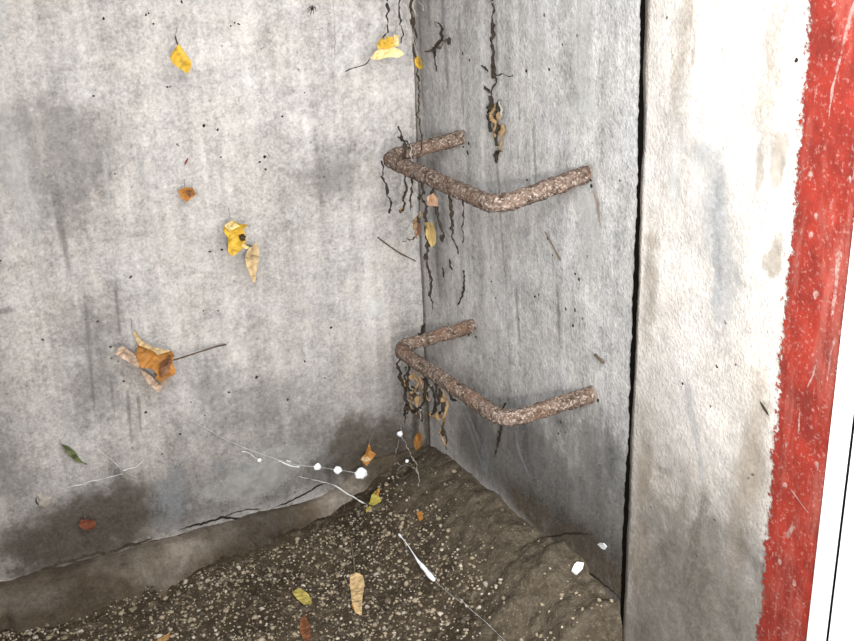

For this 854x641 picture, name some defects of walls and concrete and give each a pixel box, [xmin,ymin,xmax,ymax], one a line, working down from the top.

crack [589,0,645,627]
damp [331,389,429,479]
damp [4,476,156,575]
crack [103,483,326,555]
crack [550,531,592,539]